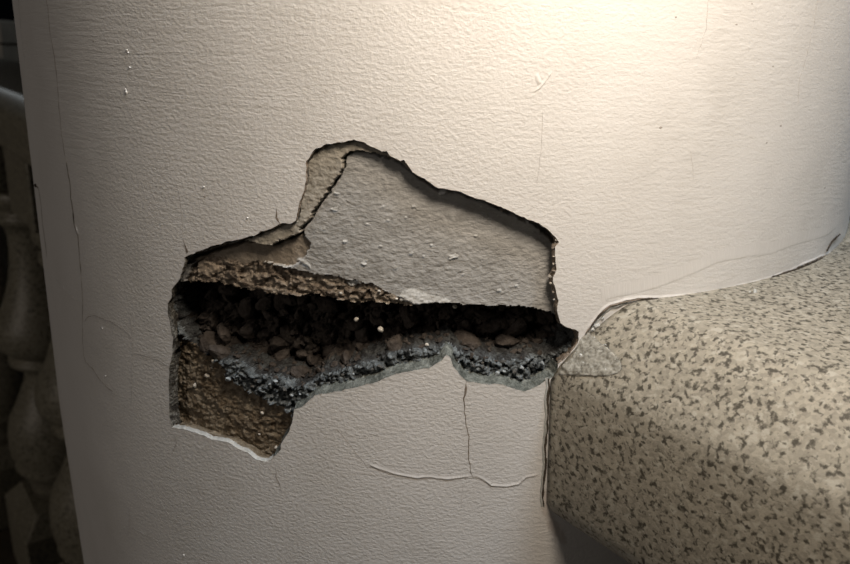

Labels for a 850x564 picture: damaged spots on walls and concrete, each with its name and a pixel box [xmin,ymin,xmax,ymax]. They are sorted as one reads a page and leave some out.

flaking render [168,140,579,462]
crack [584,234,841,334]
crack [336,377,550,507]